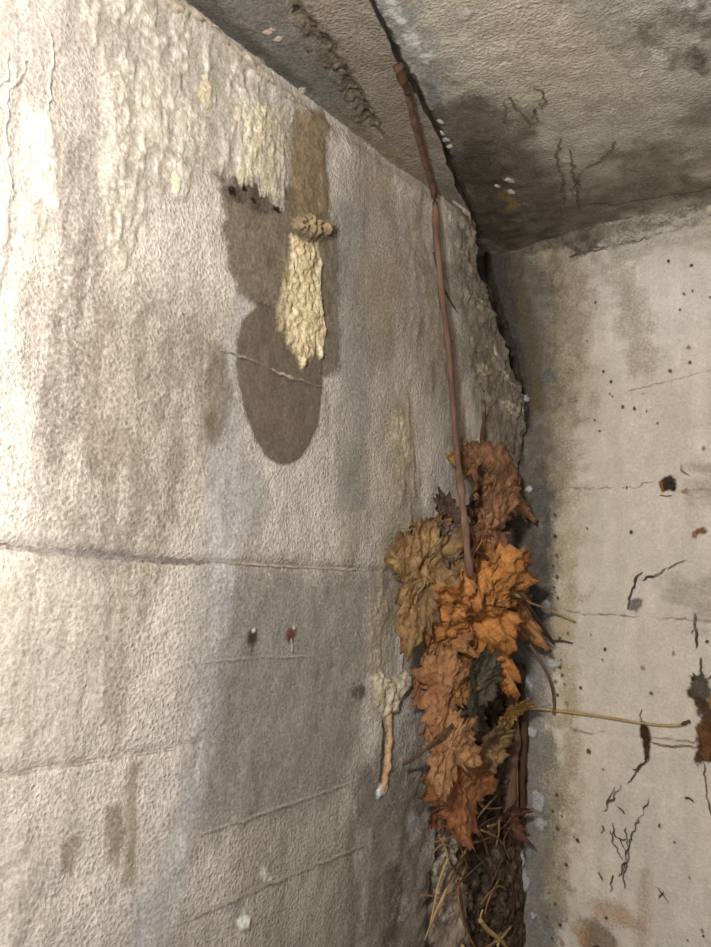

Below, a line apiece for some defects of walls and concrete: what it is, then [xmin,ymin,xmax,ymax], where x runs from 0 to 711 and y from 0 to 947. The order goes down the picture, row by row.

crack [502,85,547,127]
crack [554,138,616,210]
spalling [438,200,527,465]
leakage [0,0,420,947]
leakage [378,0,711,947]
crack [0,539,361,570]
crack [567,560,686,618]
rust [247,628,256,656]
rust [286,626,295,651]